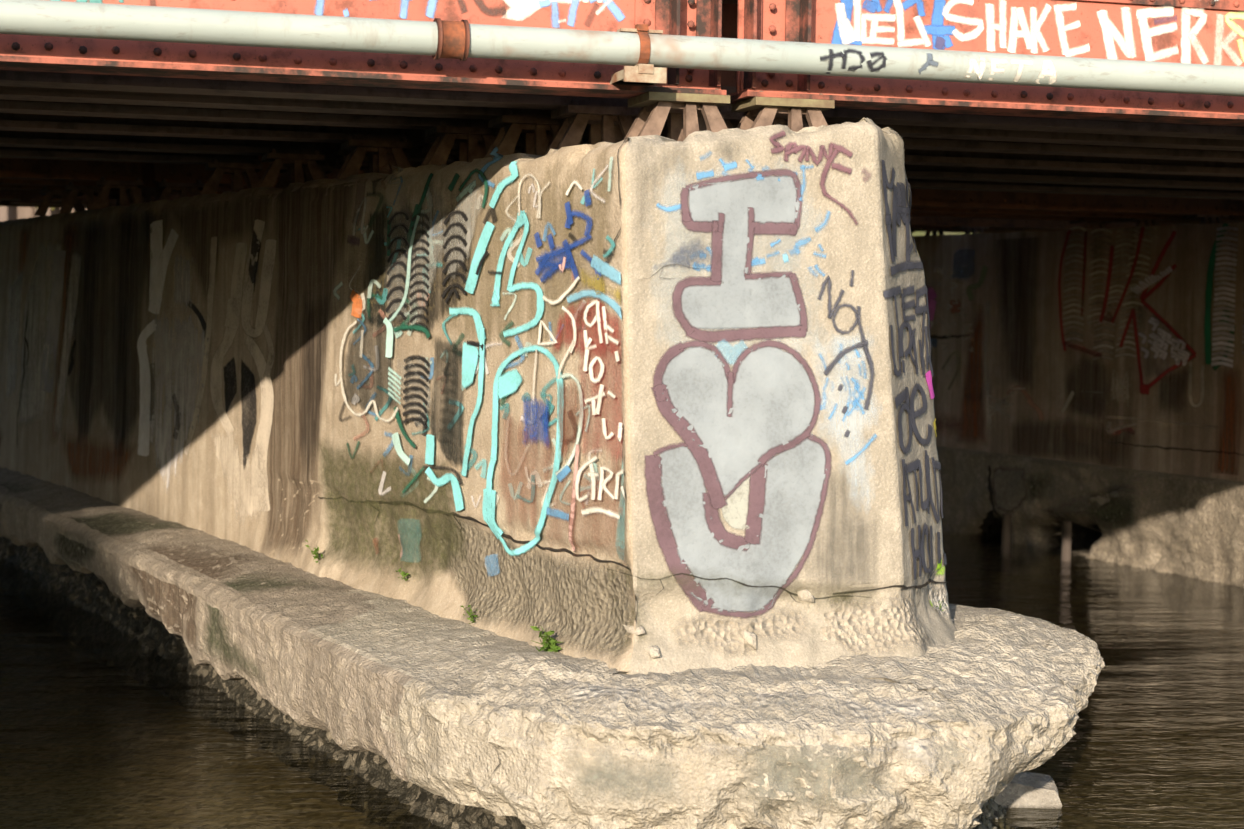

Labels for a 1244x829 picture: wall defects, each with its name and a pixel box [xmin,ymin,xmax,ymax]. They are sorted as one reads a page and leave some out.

water stain [7,182,351,546]
crack [318,497,948,606]